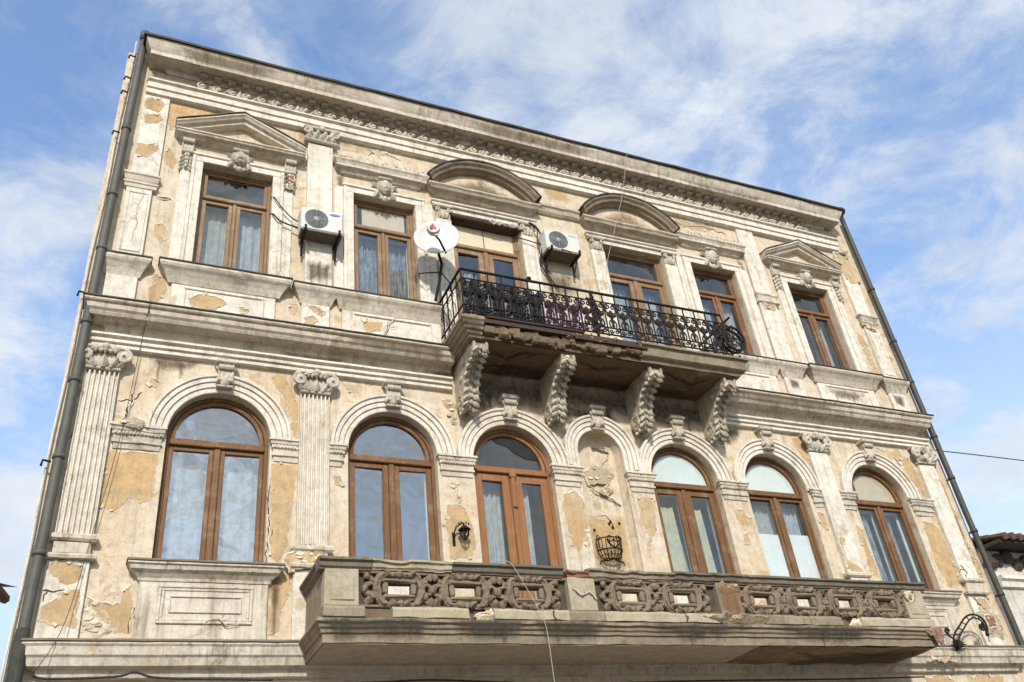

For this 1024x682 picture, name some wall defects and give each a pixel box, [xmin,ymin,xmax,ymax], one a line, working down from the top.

peeling [143,96,217,130]
peeling [135,143,177,169]
peeling [147,273,168,302]
peeling [187,292,250,314]
peeling [98,449,159,511]
peeling [266,462,327,636]
peeling [442,482,477,560]
peeling [561,466,615,552]
crack [589,447,622,507]
peeling [36,559,133,638]